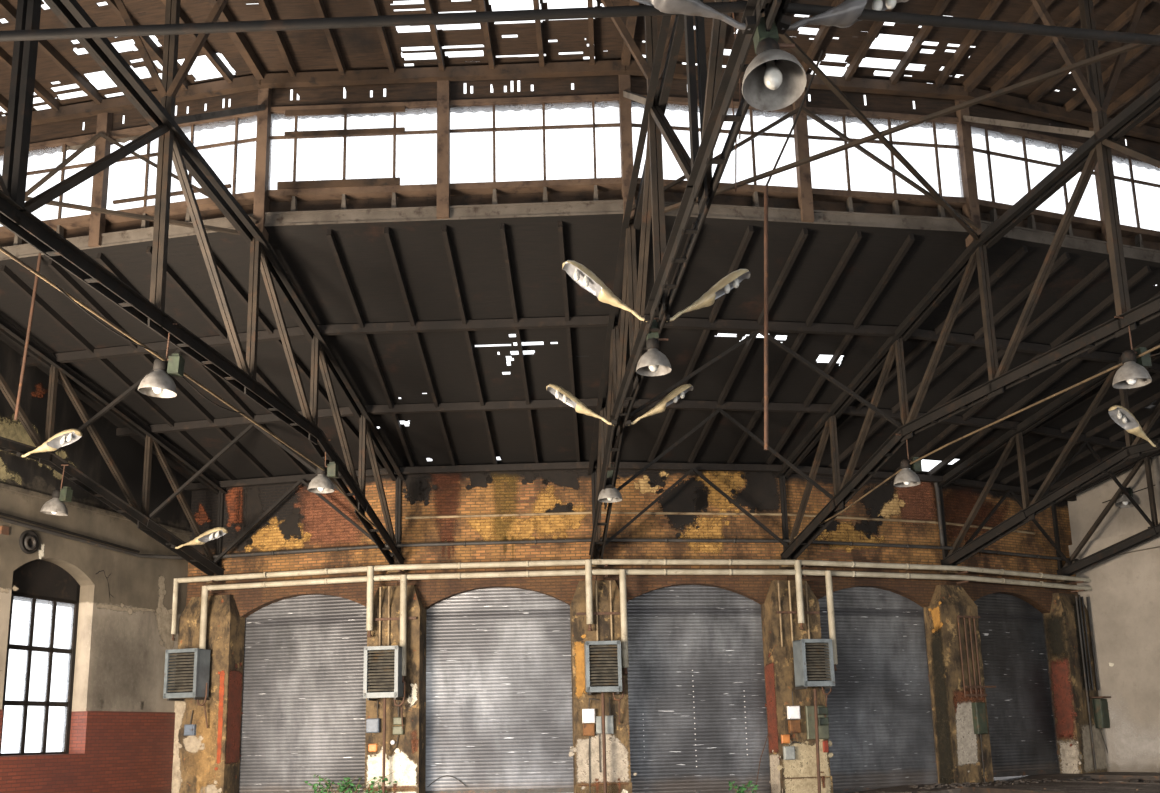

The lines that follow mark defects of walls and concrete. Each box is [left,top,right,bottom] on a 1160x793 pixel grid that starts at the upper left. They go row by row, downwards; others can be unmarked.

peeling [469,471,585,541]
peeling [633,471,669,494]
peeling [675,471,755,554]
flaking render [817,482,937,552]
peeling [928,601,943,633]
peeling [171,663,243,793]
peeling [363,746,417,793]
peeling [569,731,637,793]
peeling [764,653,833,793]
peeling [955,701,978,773]